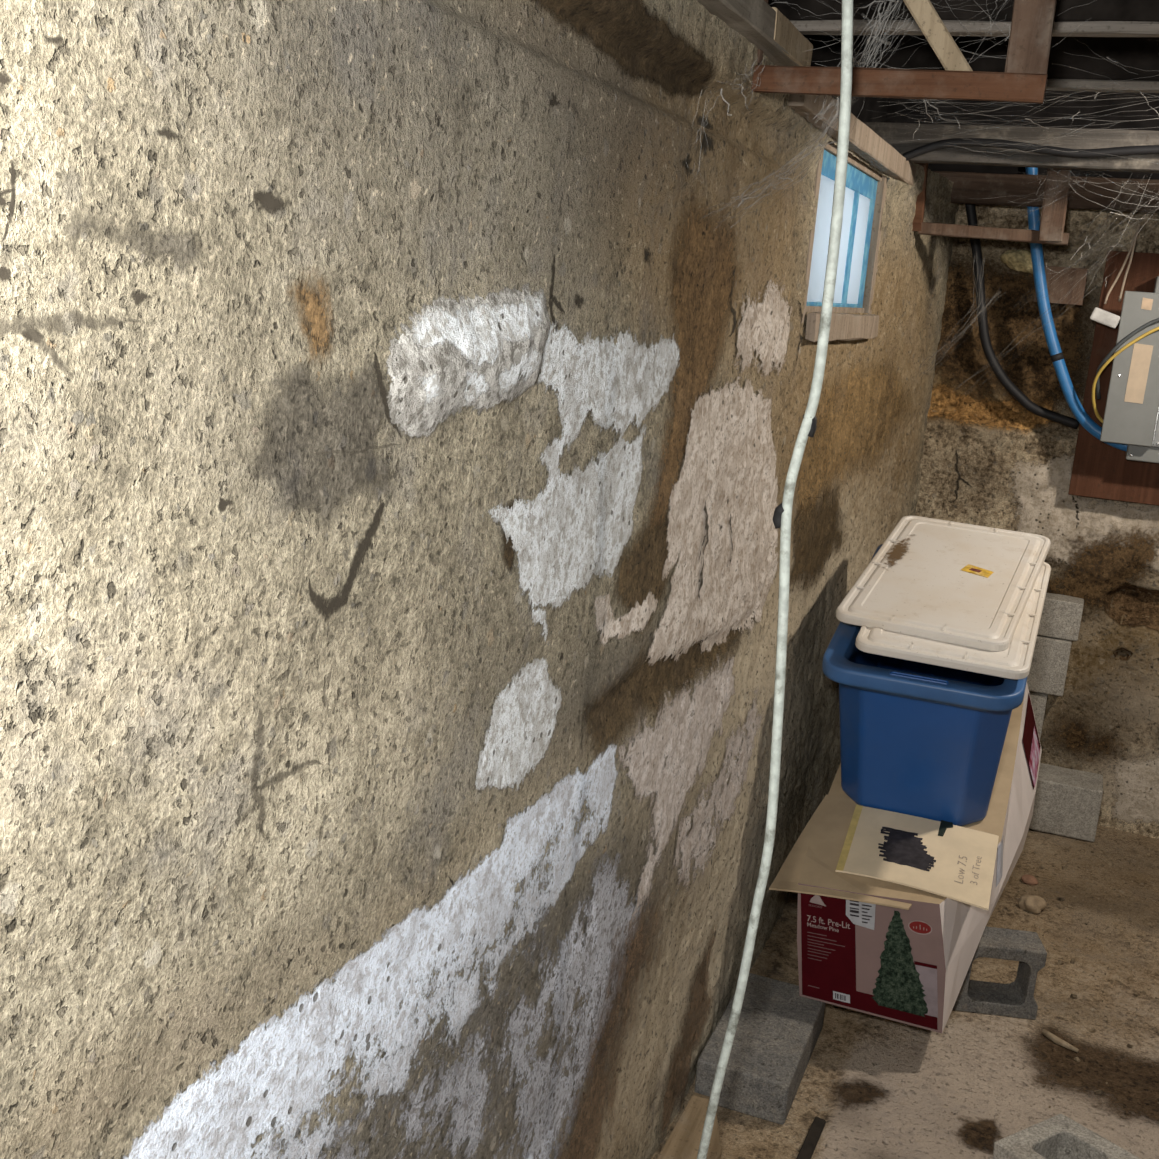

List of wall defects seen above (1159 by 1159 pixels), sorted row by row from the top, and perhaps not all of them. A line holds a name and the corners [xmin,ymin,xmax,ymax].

damp [535,0,713,97]
crack [0,312,140,378]
rust [295,282,332,355]
damp [253,364,391,521]
damp [503,526,515,570]
peeling [475,274,792,795]
damp [392,611,764,1159]
damp [312,1089,385,1159]